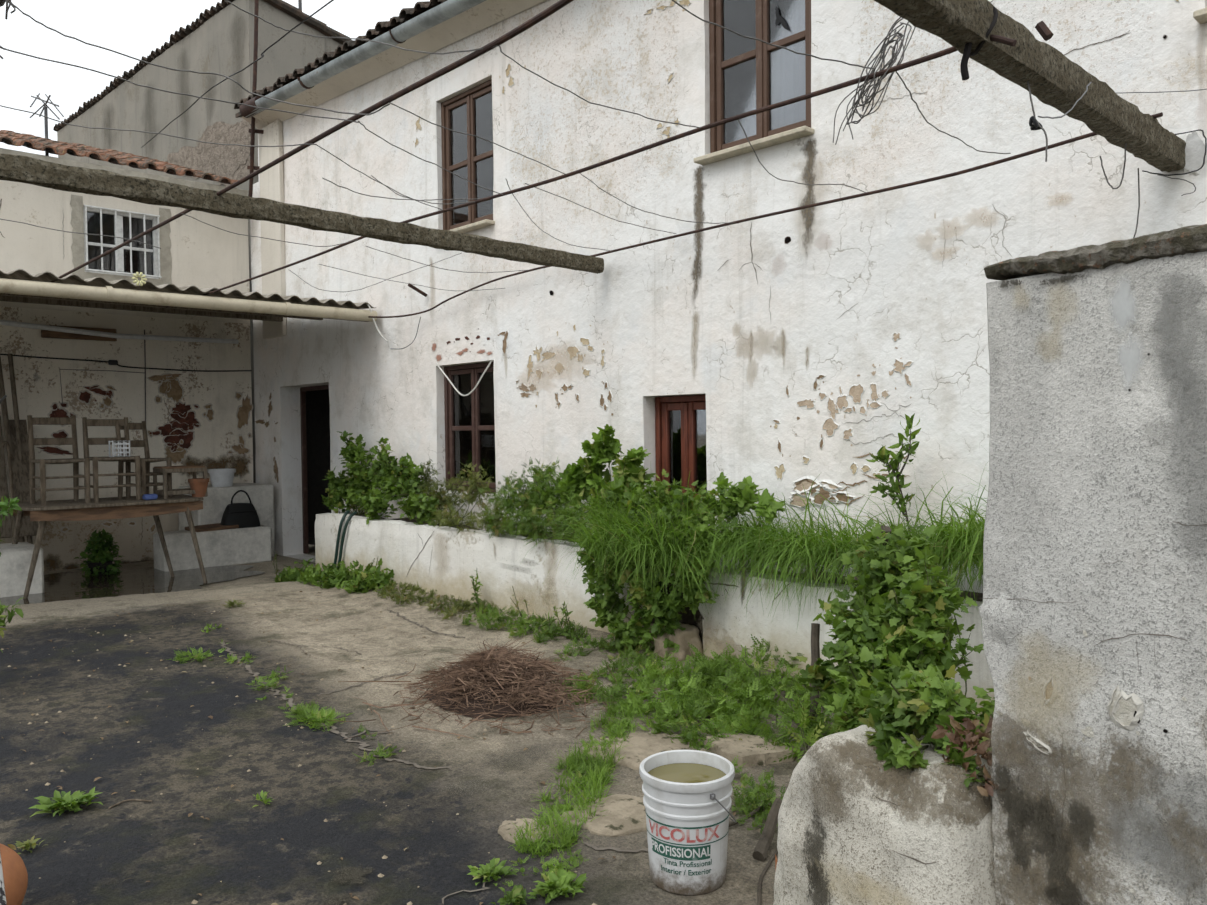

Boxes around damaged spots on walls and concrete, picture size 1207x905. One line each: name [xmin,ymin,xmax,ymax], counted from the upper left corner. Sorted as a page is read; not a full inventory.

water stain [692,166,704,298]
water stain [801,140,816,245]
flaking render [36,385,117,456]
flaking render [147,373,214,465]
peeling [446,328,509,355]
peeling [516,324,613,416]
peeling [770,332,913,511]
water stain [803,714,1207,905]